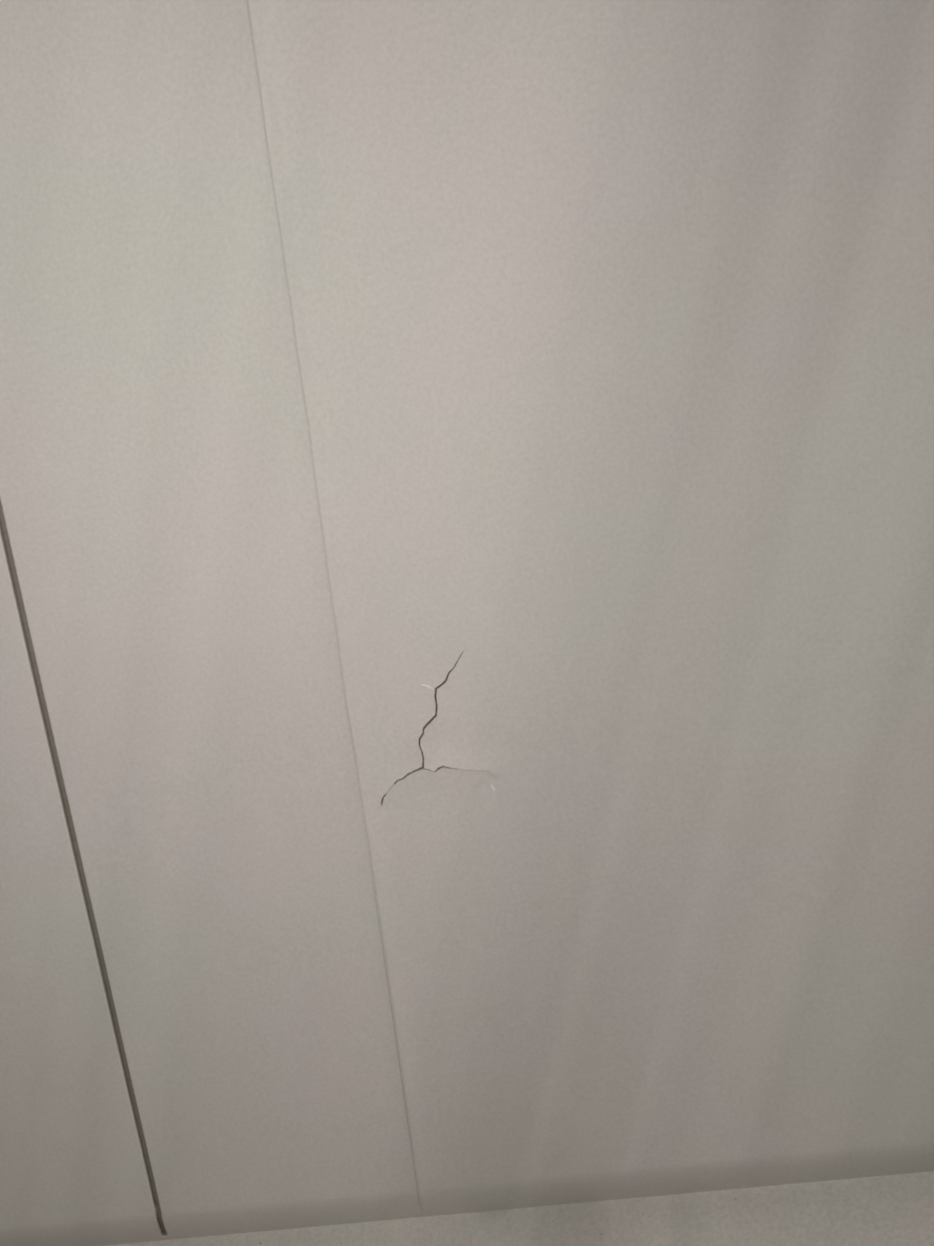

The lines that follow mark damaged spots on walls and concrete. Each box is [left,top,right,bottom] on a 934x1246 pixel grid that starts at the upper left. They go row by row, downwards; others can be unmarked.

crack [372,648,516,857]
crack [371,873,422,1210]